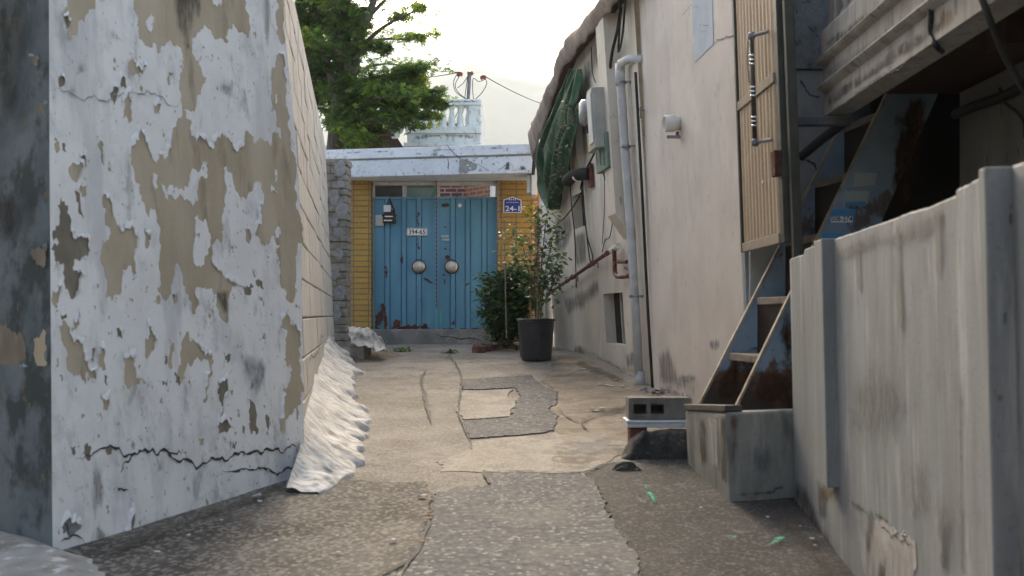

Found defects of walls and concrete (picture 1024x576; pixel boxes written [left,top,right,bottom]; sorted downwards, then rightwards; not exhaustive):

crack [53,87,177,107]
rust [893,99,925,208]
peeling [31,0,304,449]
rust [375,303,487,329]
peeling [71,443,91,461]
crack [76,444,297,491]
leakage [700,417,736,482]
spalling [61,510,85,543]
peeling [872,519,917,576]